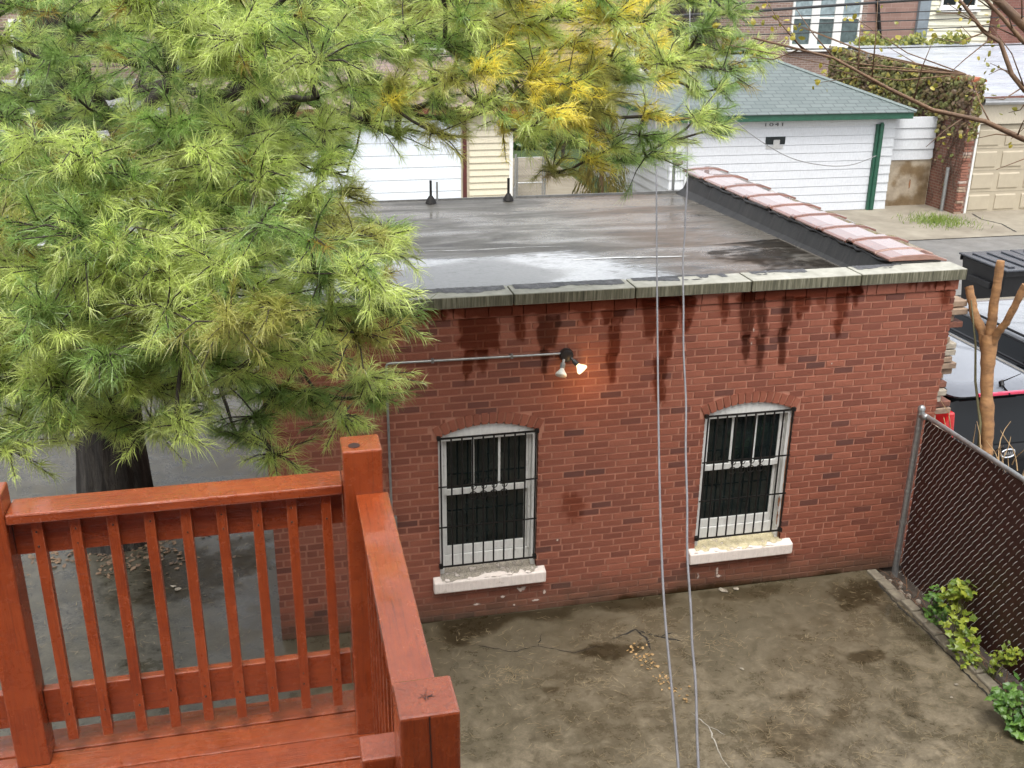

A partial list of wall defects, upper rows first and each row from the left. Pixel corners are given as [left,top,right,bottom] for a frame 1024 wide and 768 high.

spalling [933,296,968,430]